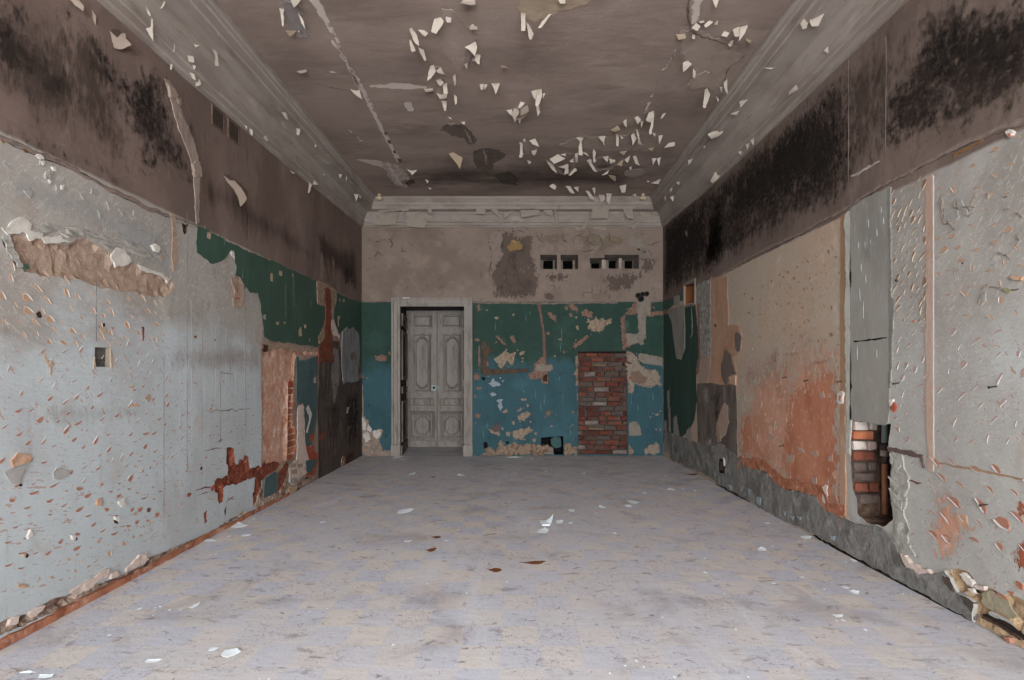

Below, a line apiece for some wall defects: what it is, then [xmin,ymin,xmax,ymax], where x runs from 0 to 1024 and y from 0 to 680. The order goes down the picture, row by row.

leakage [0,8,193,182]
flaking render [0,135,211,298]
peeling [409,0,484,125]
peeling [506,89,545,123]
leakage [489,230,571,300]
peeling [518,0,590,40]
peeling [547,111,675,204]
leakage [604,0,1024,295]
flaking render [0,252,391,650]
peeling [474,301,663,456]
leakage [737,332,849,519]
flaking render [950,568,1024,649]